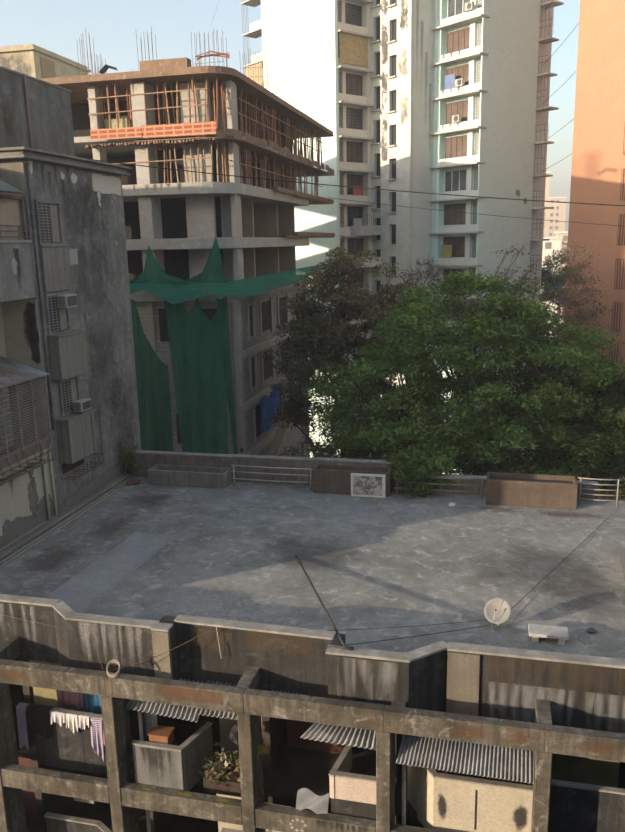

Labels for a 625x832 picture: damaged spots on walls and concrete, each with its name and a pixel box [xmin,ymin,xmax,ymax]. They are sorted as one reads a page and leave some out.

leakage [399,0,408,31]
peeling [92,173,121,212]
leakage [0,461,54,549]
leakage [12,603,30,636]